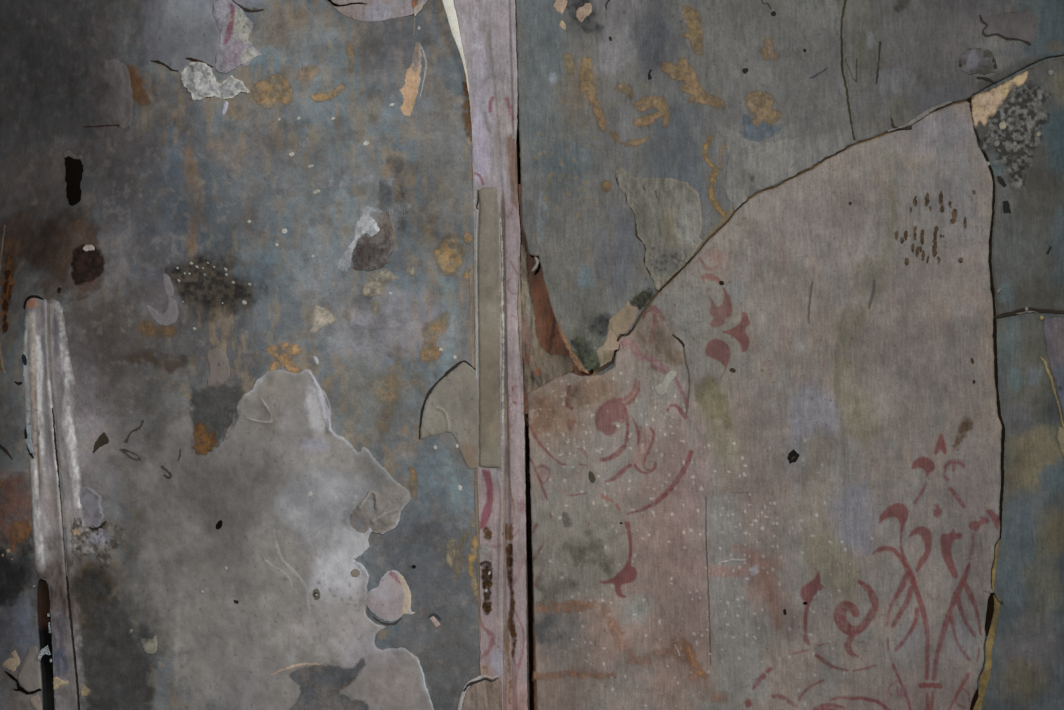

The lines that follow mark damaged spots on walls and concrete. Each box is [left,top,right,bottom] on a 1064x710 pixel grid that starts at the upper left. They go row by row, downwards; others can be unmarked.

peeling [136,0,318,109]
flaking render [63,150,83,206]
rust [0,209,106,332]
peeling [419,360,479,469]
crack [672,334,690,414]
peeling [71,343,433,710]